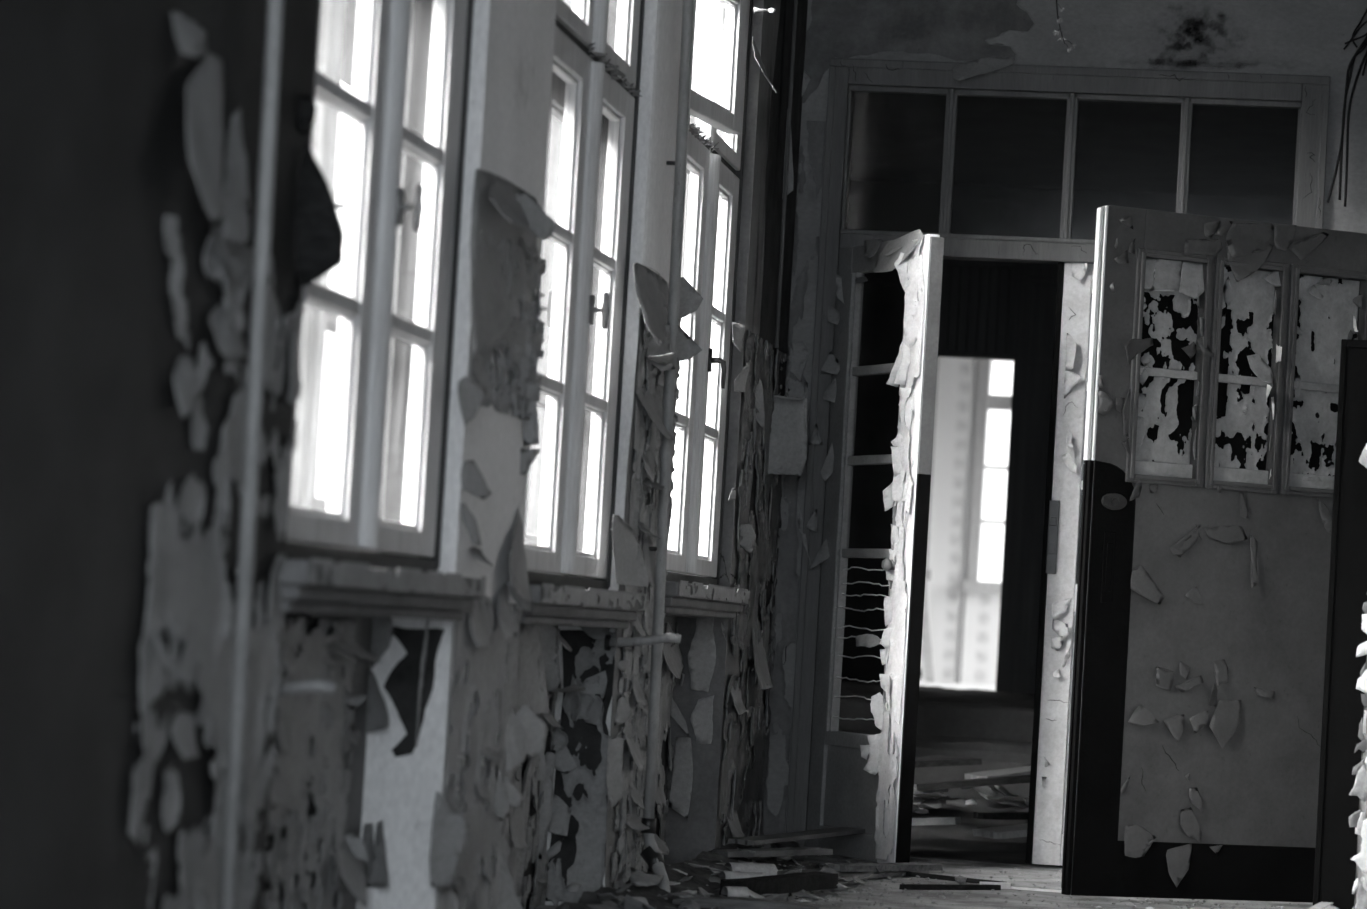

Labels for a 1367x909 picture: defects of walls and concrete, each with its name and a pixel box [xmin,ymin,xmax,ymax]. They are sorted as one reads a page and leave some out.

peeling [1071,262,1087,281]
peeling [1064,333,1081,399]
peeling [1097,215,1362,534]
peeling [128,0,1036,909]
peeling [1061,429,1077,473]
peeling [1359,444,1367,468]
peeling [1131,565,1165,604]
peeling [1051,598,1071,678]
peeling [1129,659,1275,748]
peeling [1349,602,1367,909]
peeling [1124,773,1222,887]